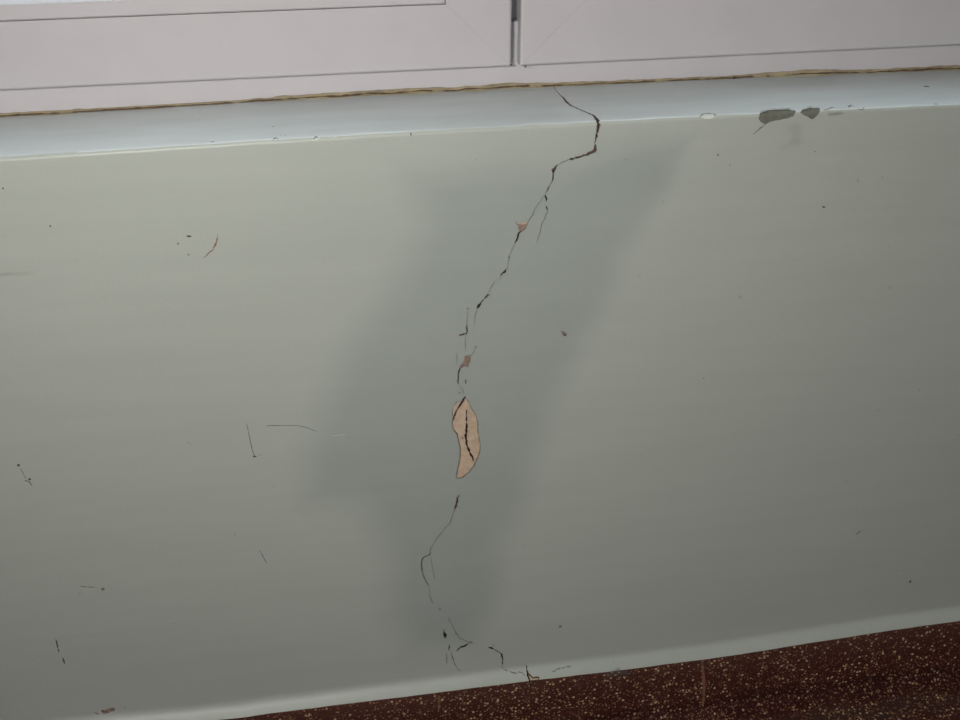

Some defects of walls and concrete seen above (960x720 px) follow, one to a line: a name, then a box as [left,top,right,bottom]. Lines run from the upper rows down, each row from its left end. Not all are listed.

spalling [753,105,864,134]
crack [456,87,601,406]
spalling [452,398,481,479]
crack [420,495,531,692]